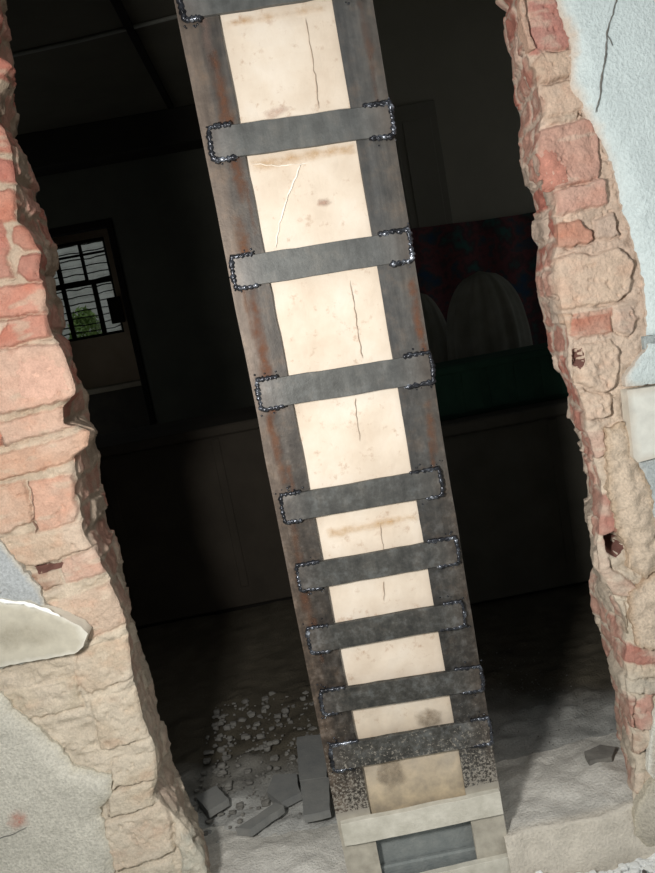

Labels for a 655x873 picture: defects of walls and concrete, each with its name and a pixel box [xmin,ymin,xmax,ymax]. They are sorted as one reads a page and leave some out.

spalling [0,57,12,84]
spalling [0,125,207,873]
spalling [516,0,655,800]
crack [596,0,617,110]